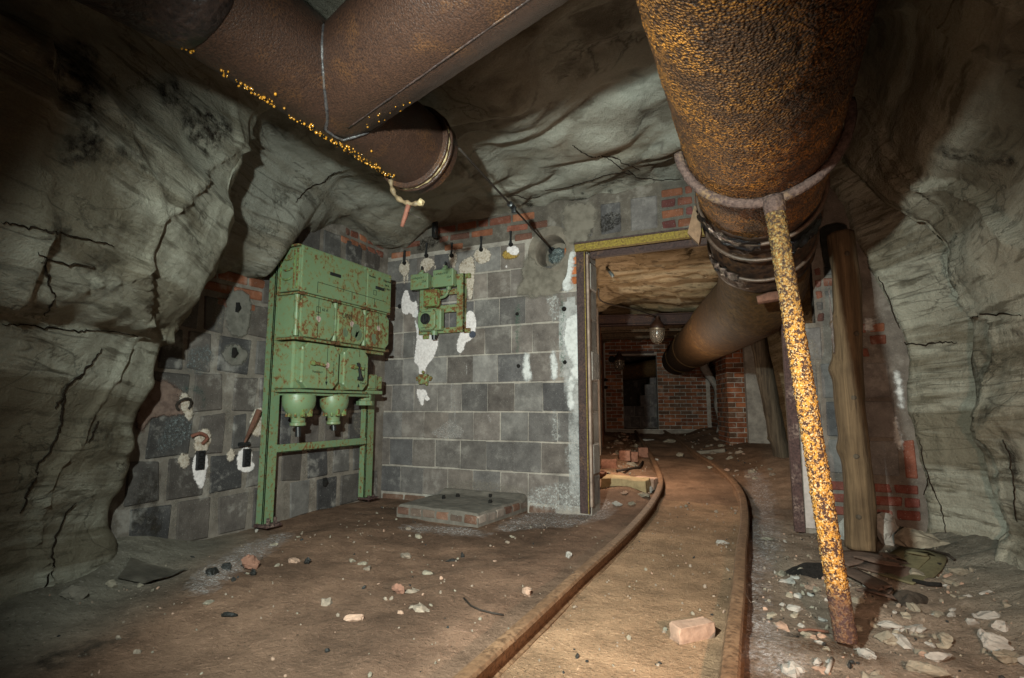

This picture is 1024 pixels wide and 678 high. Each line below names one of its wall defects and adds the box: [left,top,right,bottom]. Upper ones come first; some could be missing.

crack [969,312,1022,320]
crack [1,221,138,513]
peeling [177,429,212,488]
peeling [227,447,255,472]
peeling [250,407,262,437]
damp [448,296,609,531]
crack [919,441,946,533]
crack [1002,440,1018,522]
crack [44,503,76,588]